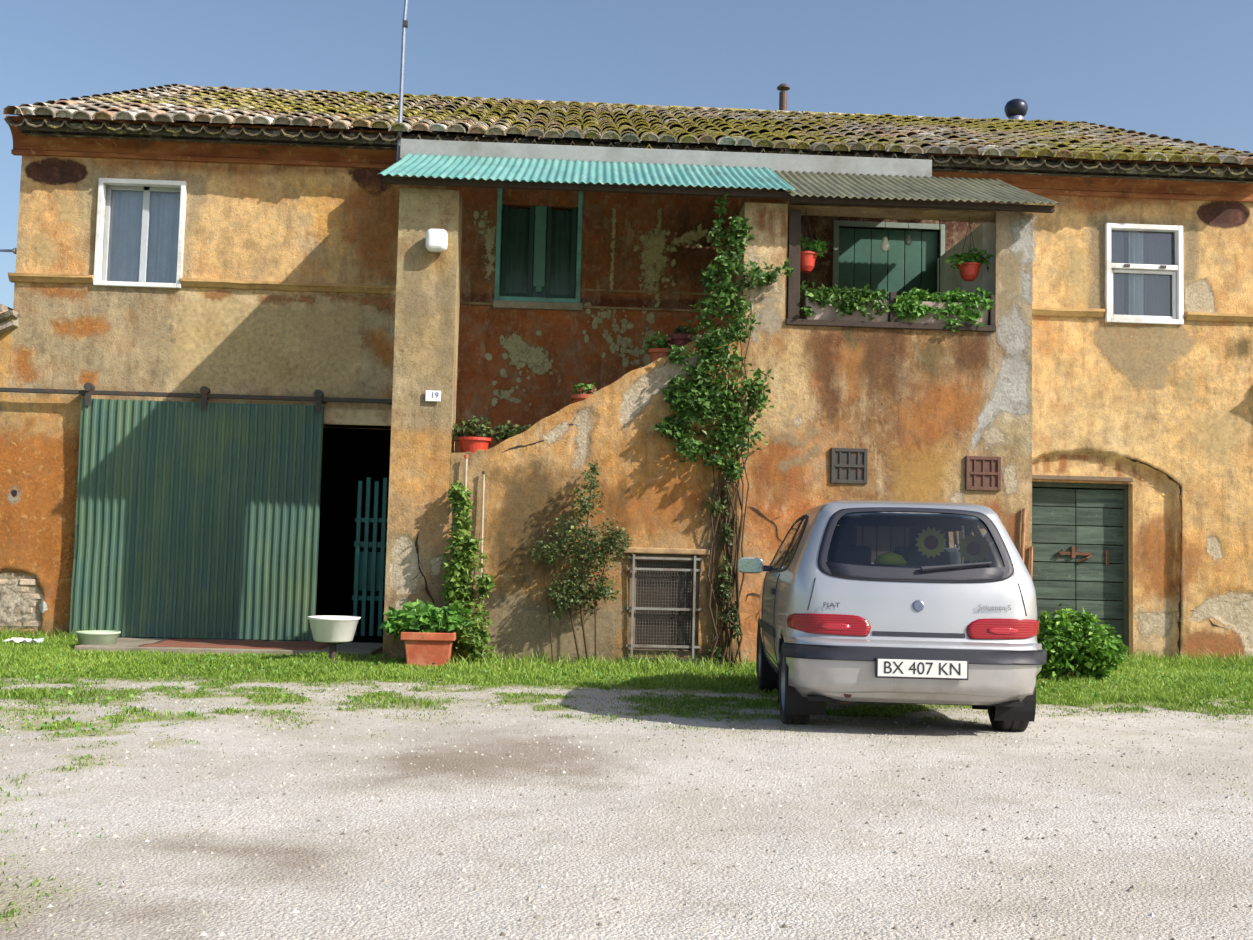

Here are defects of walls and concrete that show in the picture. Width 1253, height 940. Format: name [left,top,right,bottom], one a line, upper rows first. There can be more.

peeling [473,210,496,280]
peeling [484,330,561,406]
flaking render [583,224,729,429]
flaking render [972,218,1036,449]
crack [504,409,579,452]
flaking render [1002,463,1019,494]
crack [747,506,782,542]
flaking render [389,534,443,610]
crack [412,533,436,604]
flaking render [1135,591,1253,662]